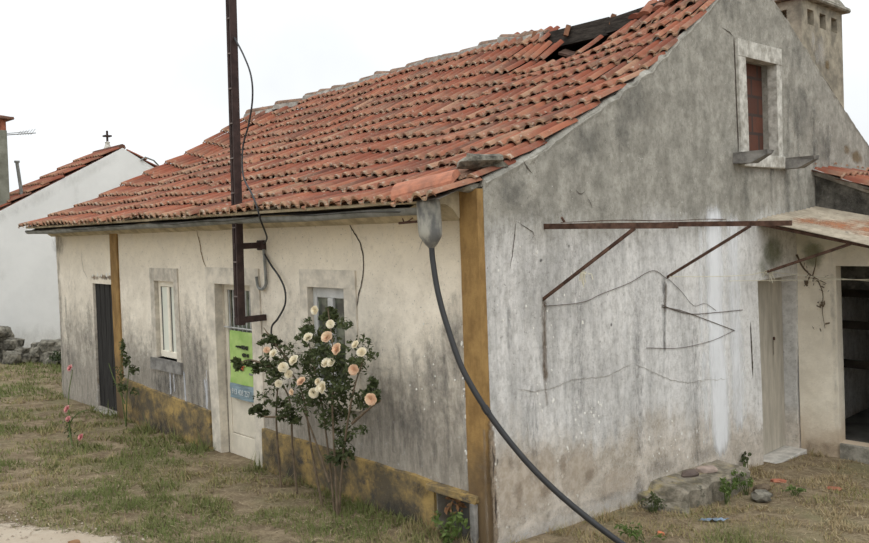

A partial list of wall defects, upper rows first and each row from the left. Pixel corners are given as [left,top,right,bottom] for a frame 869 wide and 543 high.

rust [801,219,869,235]